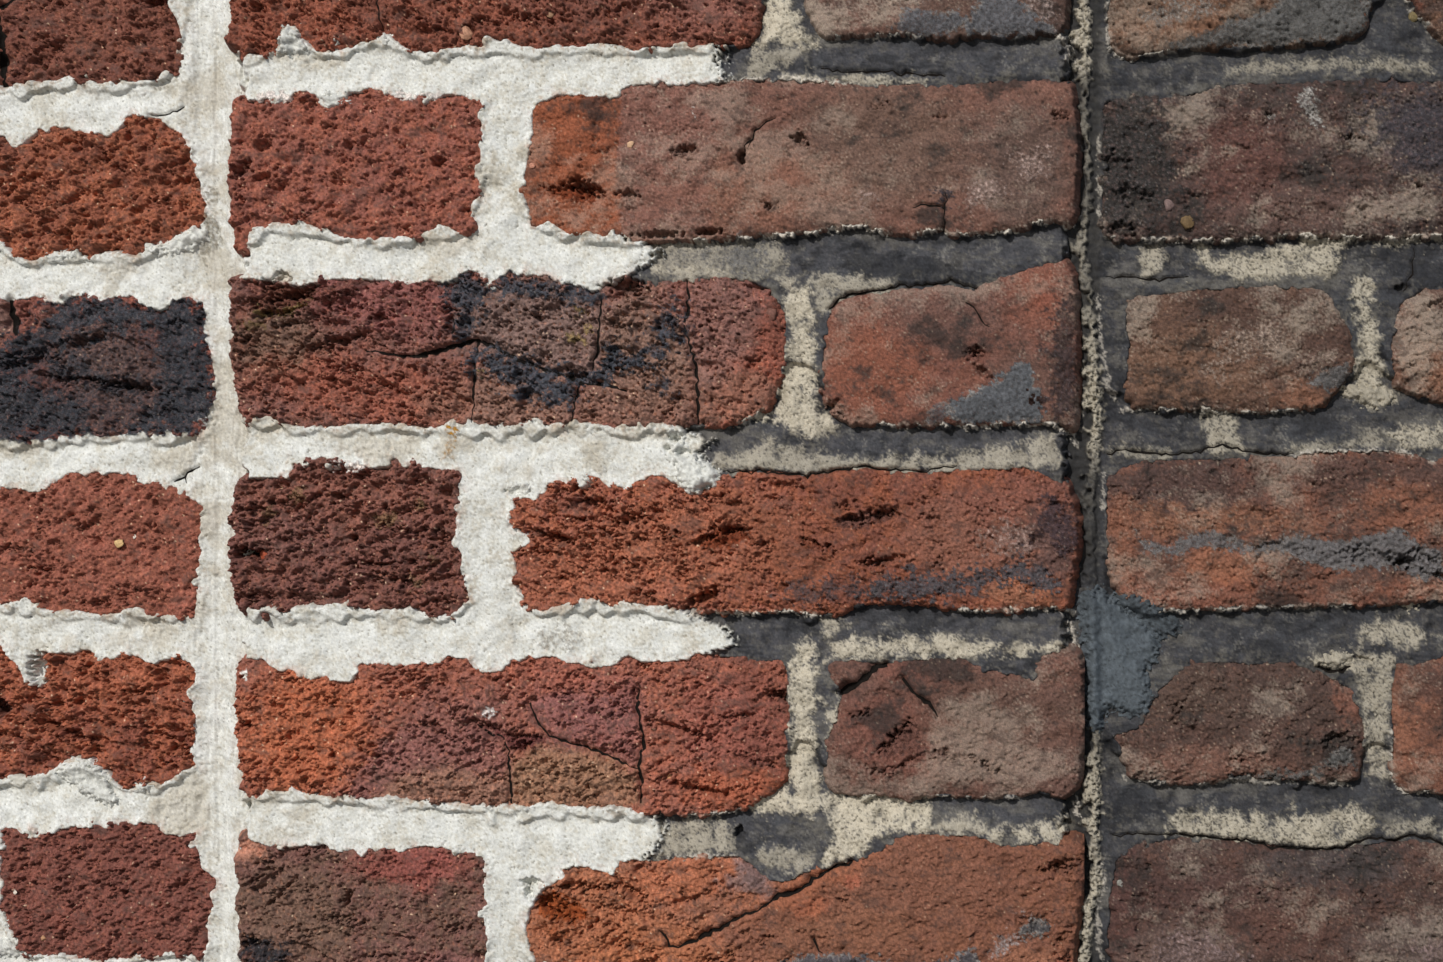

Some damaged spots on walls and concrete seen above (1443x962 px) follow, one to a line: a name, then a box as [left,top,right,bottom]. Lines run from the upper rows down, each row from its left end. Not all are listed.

crack [0,0,14,87]
crack [366,298,627,423]
crack [683,281,700,424]
crack [477,724,513,803]
crack [529,688,646,803]
crack [660,860,853,948]